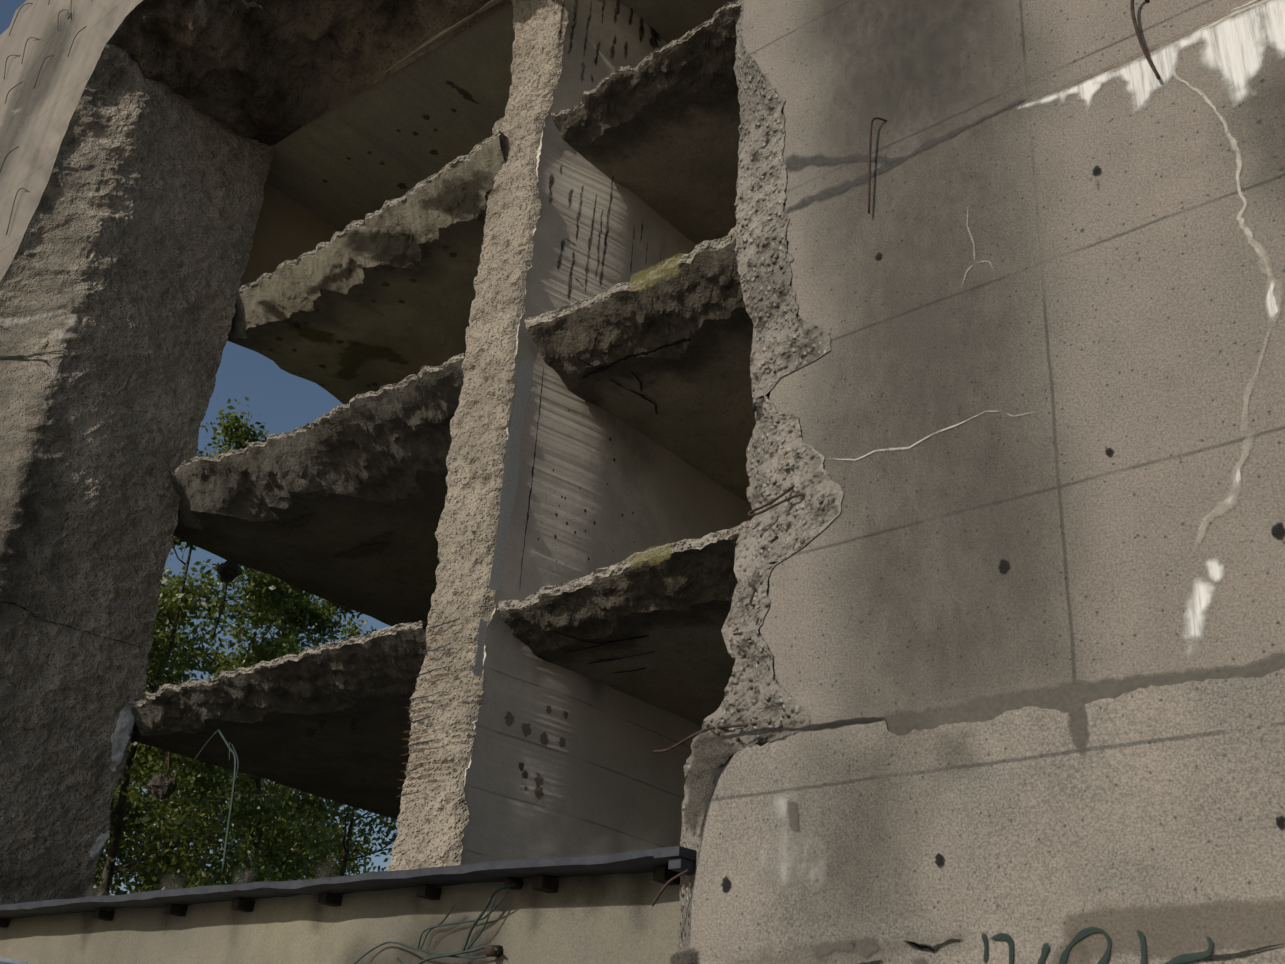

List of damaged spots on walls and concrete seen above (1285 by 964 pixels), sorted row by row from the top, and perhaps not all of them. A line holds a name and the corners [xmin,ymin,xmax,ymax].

leakage [1026,0,1285,106]
crack [1172,68,1280,318]
peeling [489,360,534,591]
spalling [683,87,844,835]
crack [839,411,1019,460]
crack [1197,388,1251,540]
crack [0,601,143,648]
peeling [109,701,135,772]
peeling [90,831,110,861]